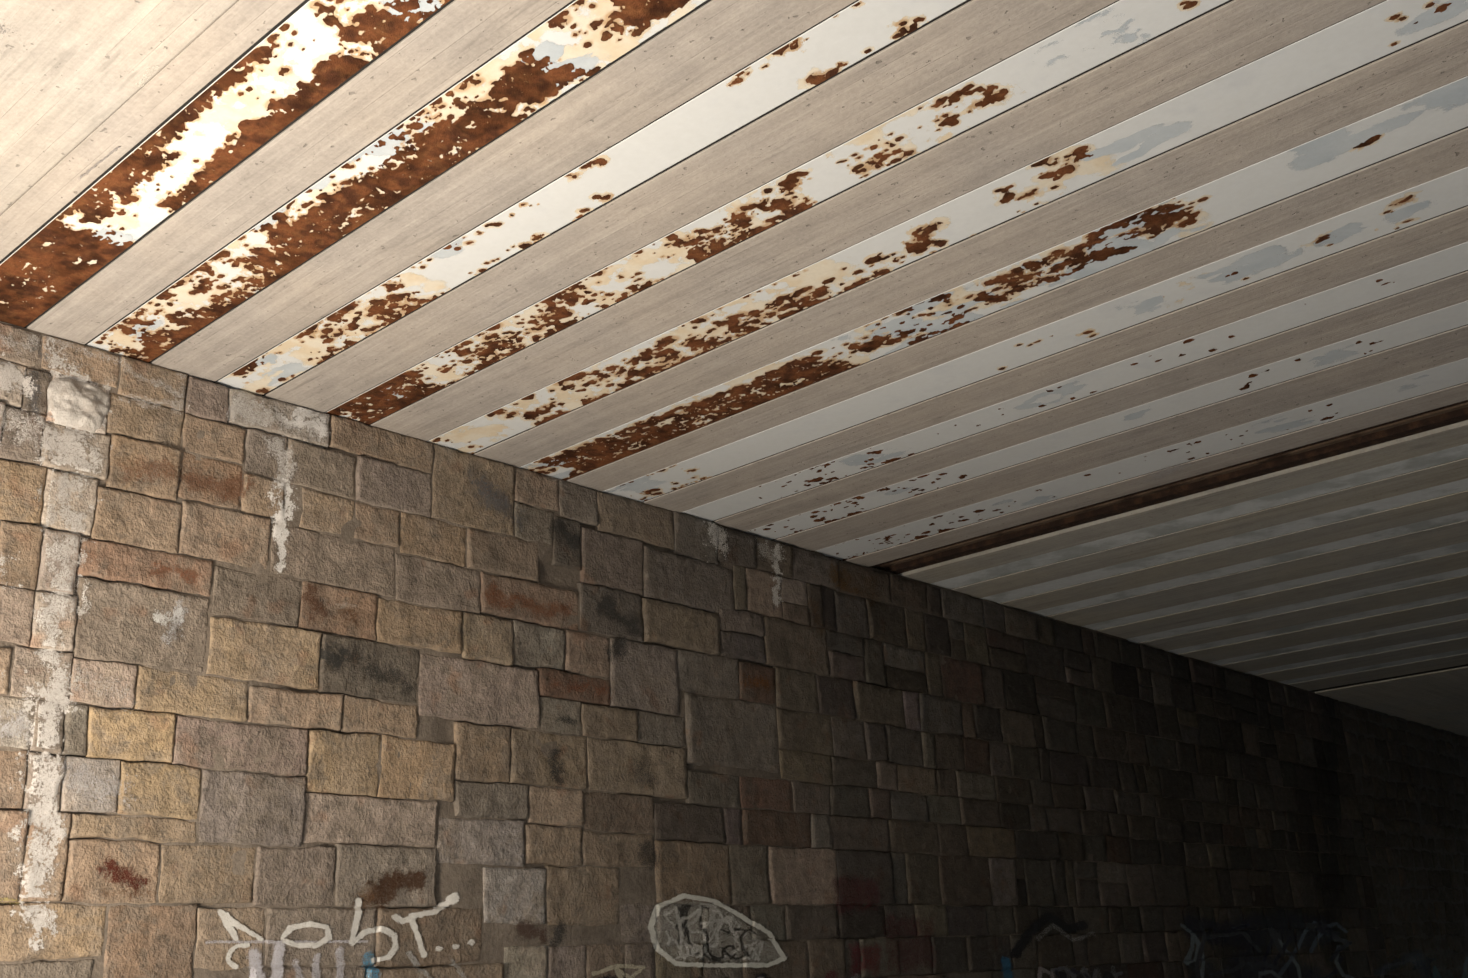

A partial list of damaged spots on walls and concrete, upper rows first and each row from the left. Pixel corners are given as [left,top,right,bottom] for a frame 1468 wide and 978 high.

peeling [0,0,445,308]
rust [0,0,450,328]
rust [95,48,607,363]
peeling [217,202,540,396]
peeling [92,0,696,361]
rust [326,171,815,425]
peeling [328,168,818,422]
rust [548,0,690,48]
rust [487,194,1208,481]
peeling [826,81,1026,179]
efflorescence [217,390,331,574]
leakage [0,328,192,951]